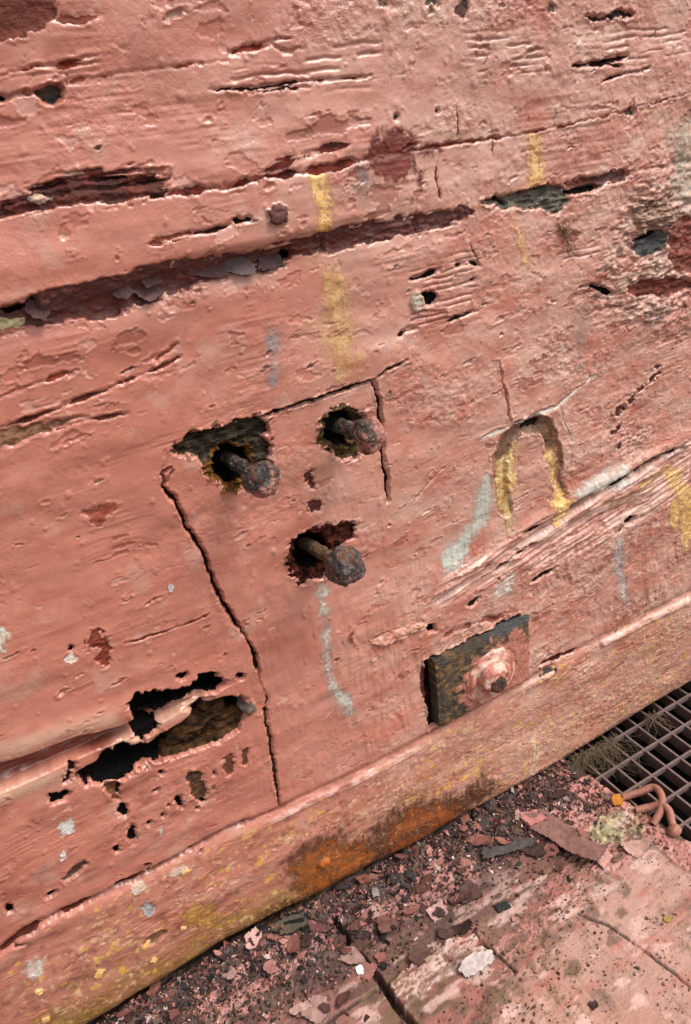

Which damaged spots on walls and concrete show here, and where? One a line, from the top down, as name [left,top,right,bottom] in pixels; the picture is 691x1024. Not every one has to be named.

peeling [0,163,626,330]
peeling [627,216,691,297]
crack [261,361,403,500]
crack [130,467,279,803]
peeling [103,781,120,799]
spalling [128,709,159,740]
peeling [186,771,207,799]
spalling [223,695,238,707]
peeling [222,748,248,775]
rust [244,773,496,929]